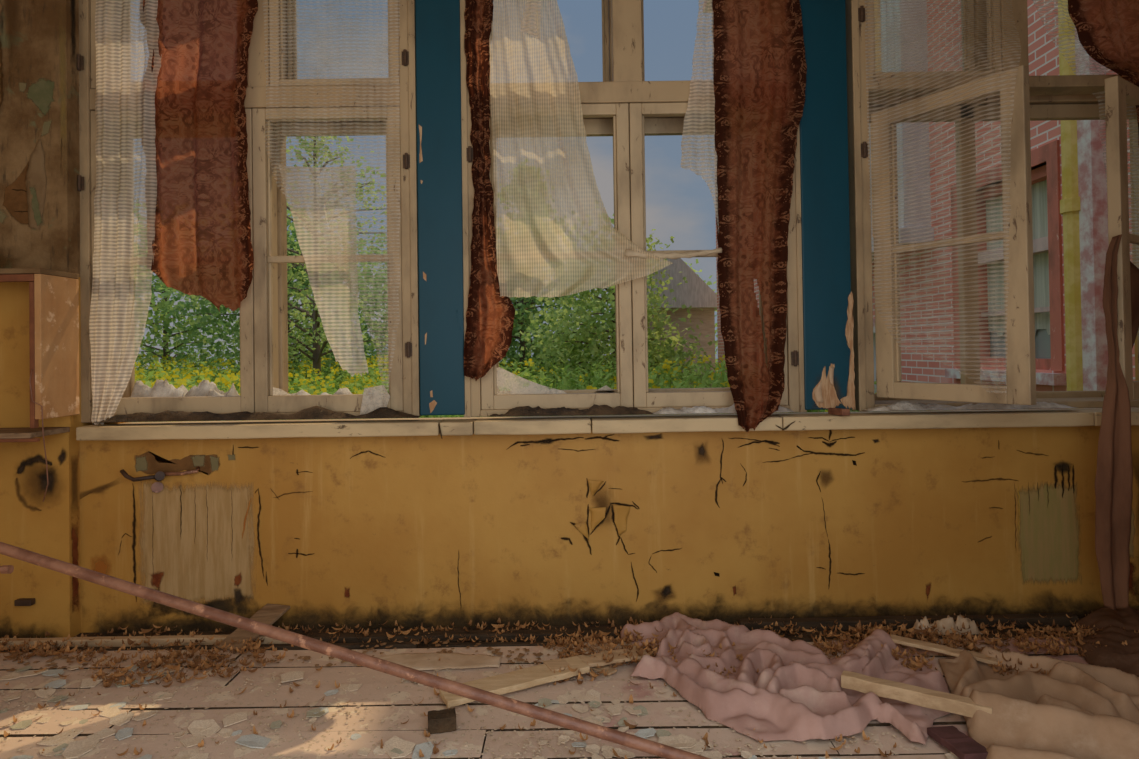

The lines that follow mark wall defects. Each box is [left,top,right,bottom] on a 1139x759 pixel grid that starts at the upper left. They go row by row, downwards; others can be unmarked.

peeling [812,291,856,411]
crack [506,434,619,452]
crack [646,432,662,440]
crack [715,421,865,508]
crack [561,478,682,601]
crack [816,500,865,586]
damp [98,599,251,633]
damp [272,597,1100,630]